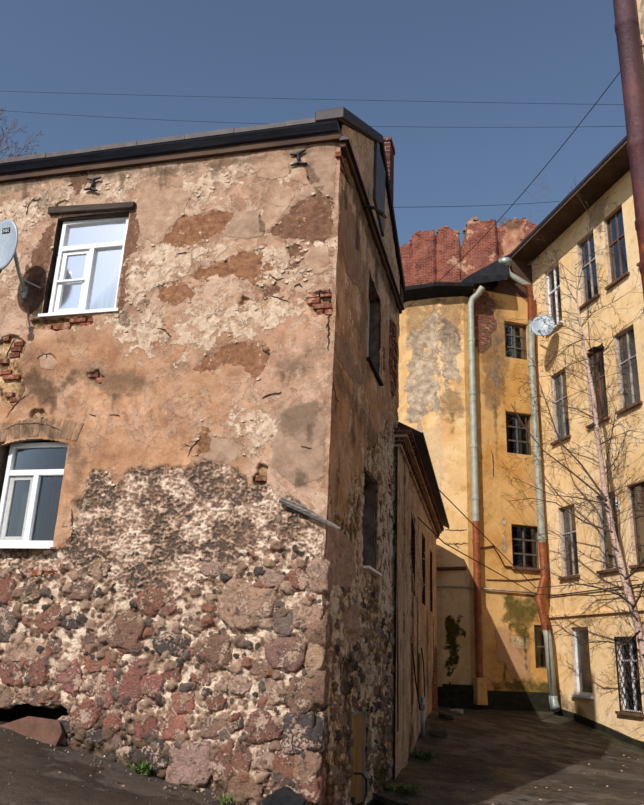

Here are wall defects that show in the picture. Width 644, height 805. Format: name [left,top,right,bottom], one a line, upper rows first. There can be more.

flaking render [0,172,138,332]
peeling [112,154,335,380]
spalling [467,291,503,388]
spalling [0,311,469,805]
damp [504,595,538,669]